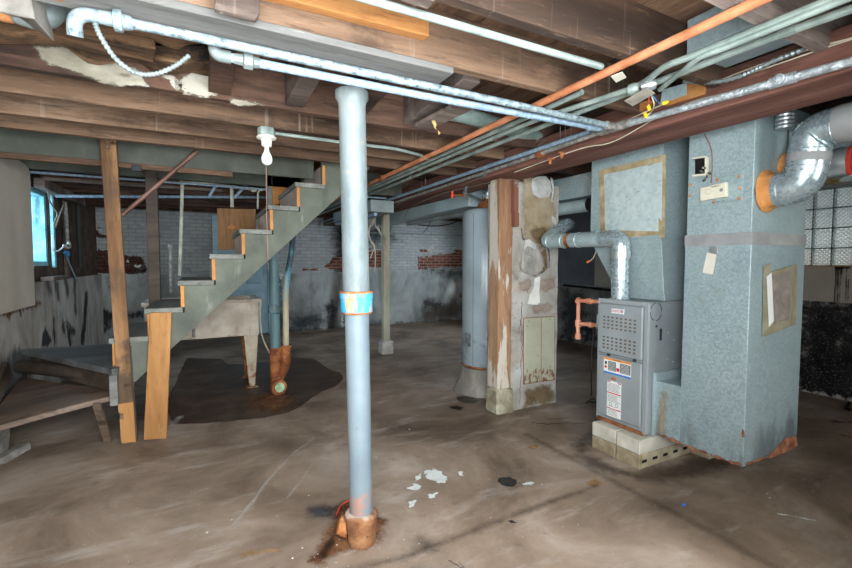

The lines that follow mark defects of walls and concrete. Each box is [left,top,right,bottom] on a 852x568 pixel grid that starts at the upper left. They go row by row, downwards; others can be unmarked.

peeling [33,46,150,87]
peeling [163,73,218,98]
flaking render [124,255,148,274]
flaking render [302,255,342,271]
flaking render [369,248,381,268]
flaking render [418,249,462,270]
leakage [42,276,88,347]
leakage [103,309,113,333]
leakage [289,270,342,332]
leakage [799,267,852,402]
rust [659,394,798,466]
rust [308,502,353,564]